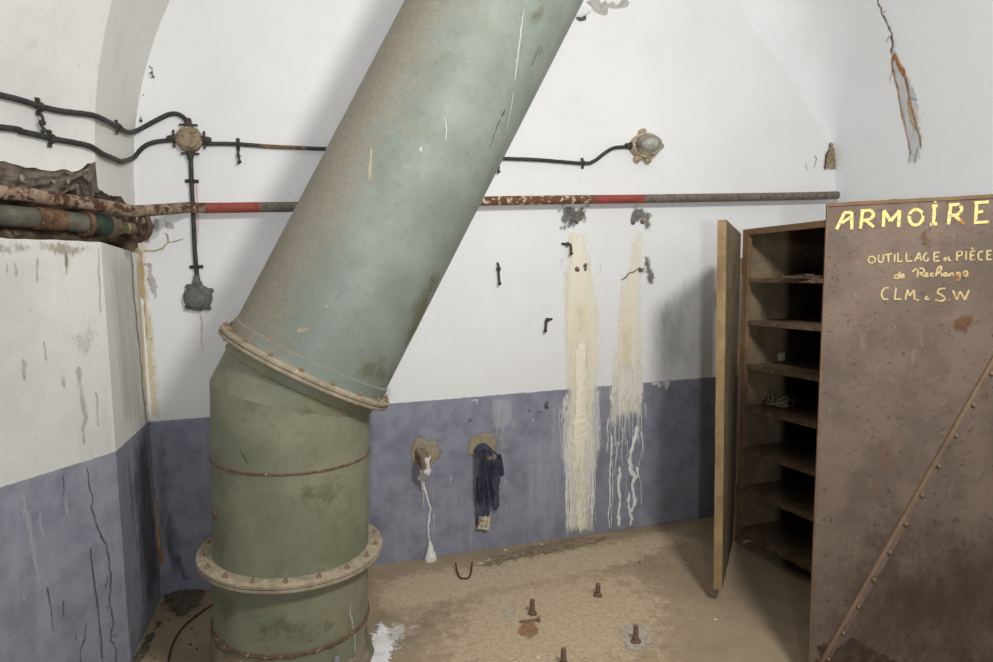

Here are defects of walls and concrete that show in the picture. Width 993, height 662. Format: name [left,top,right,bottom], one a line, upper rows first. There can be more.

peeling [575,0,629,21]
crack [877,0,921,164]
damp [375,205,692,662]
crack [62,467,119,662]
rust [519,621,538,637]